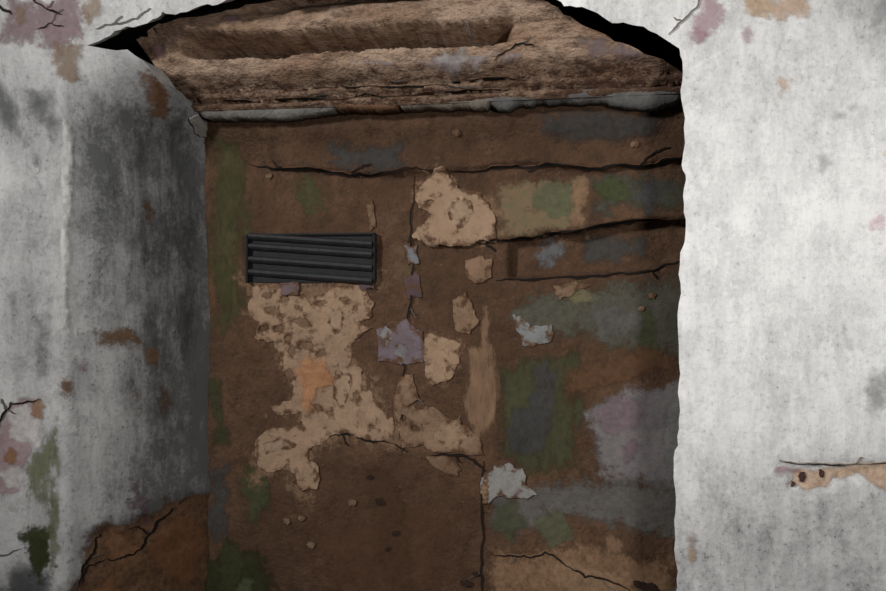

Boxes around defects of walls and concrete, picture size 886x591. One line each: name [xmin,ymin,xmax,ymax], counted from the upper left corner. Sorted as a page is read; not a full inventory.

crack [33,0,64,29]
crack [669,0,700,34]
peeling [404,164,508,300]
crack [247,147,683,320]
peeling [513,314,554,347]
peeling [232,267,484,510]
crack [0,399,41,427]
peeling [480,462,537,504]
flaking render [775,463,886,490]
flaking render [69,489,209,591]
crack [432,452,630,591]